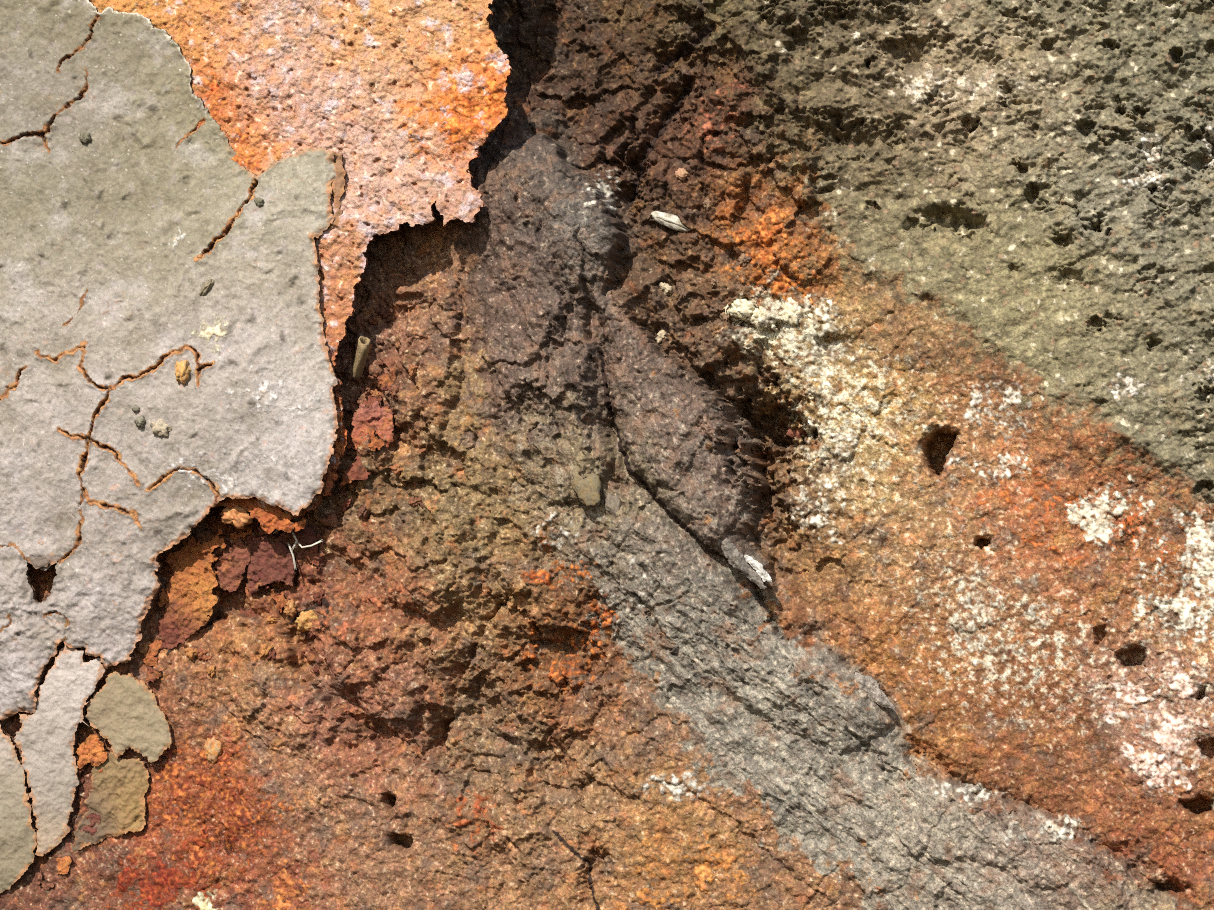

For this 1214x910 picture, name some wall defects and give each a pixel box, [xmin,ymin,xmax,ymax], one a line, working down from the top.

crack [0,13,101,153]
crack [175,118,206,148]
crack [193,178,258,262]
damp [582,170,621,219]
crack [0,289,220,563]
peeling [0,0,619,893]
damp [732,293,885,544]
damp [947,383,1044,479]
damp [1066,484,1214,643]
damp [1093,659,1214,793]
damp [927,782,999,806]
damp [1003,815,1084,846]